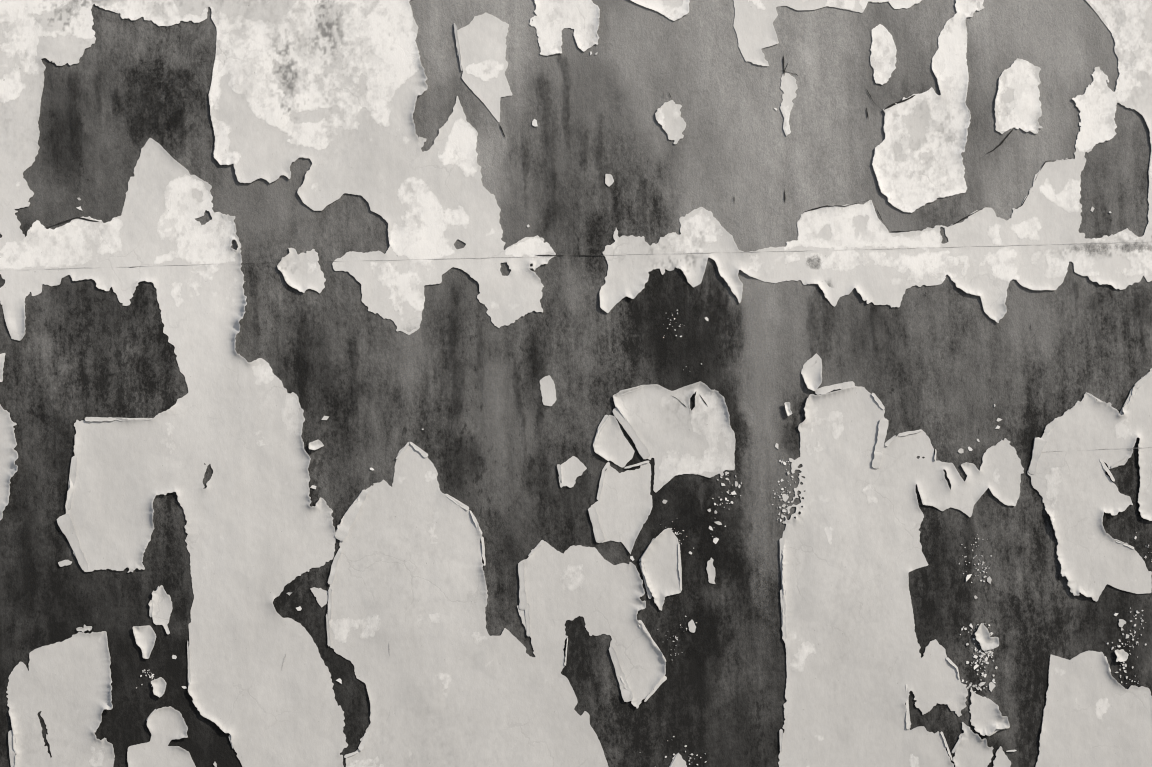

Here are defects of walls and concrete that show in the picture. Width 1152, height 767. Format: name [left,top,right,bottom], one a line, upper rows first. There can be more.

peeling [0,0,735,767]
crack [429,253,648,261]
peeling [599,0,1152,323]
crack [784,188,1013,250]
peeling [778,353,1152,767]